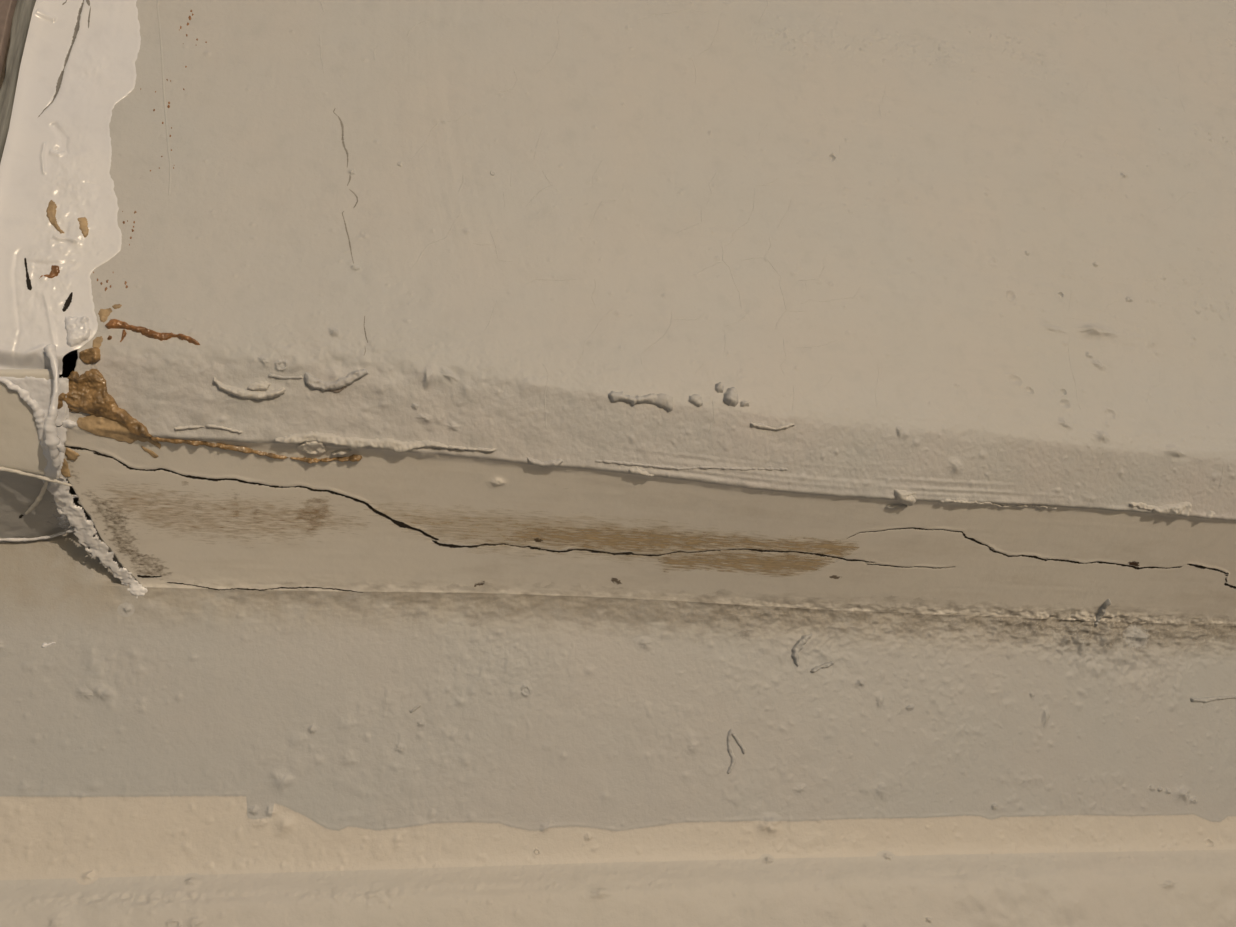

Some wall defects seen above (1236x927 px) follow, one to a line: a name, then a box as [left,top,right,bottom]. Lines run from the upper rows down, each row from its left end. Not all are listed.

rust [46,200,64,234]
rust [77,217,89,238]
rust [39,265,60,279]
rust [57,304,362,464]
crack [64,446,1236,589]
leakage [496,518,857,575]
crack [137,575,363,593]